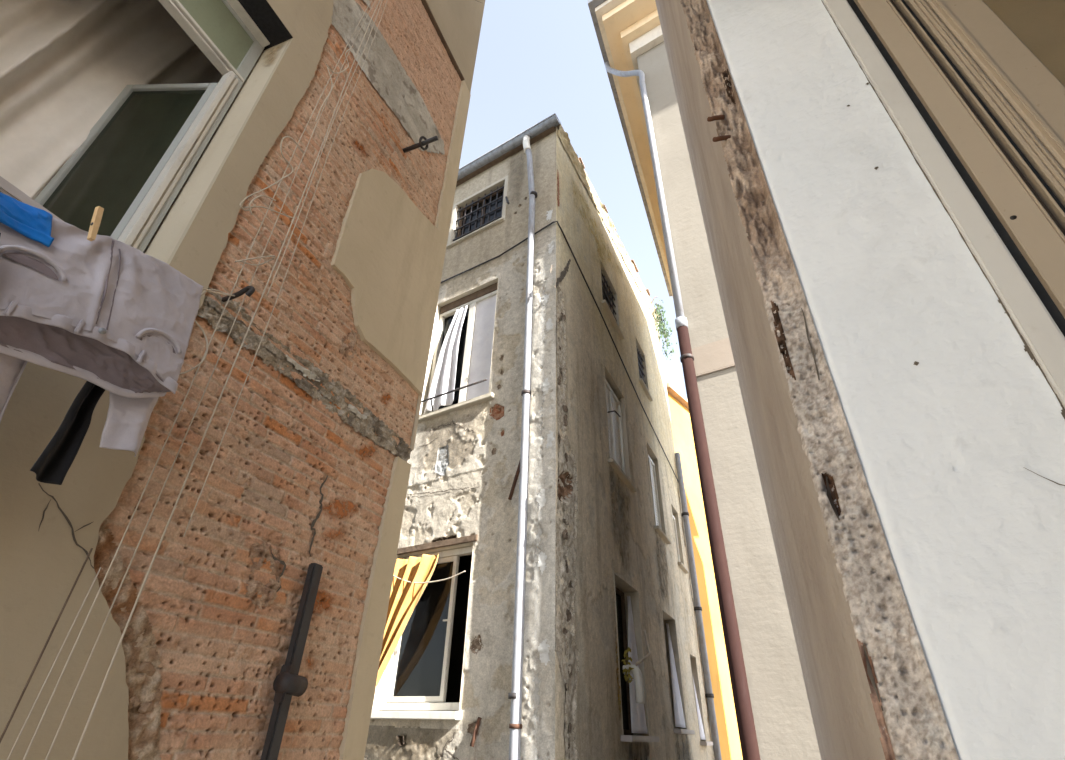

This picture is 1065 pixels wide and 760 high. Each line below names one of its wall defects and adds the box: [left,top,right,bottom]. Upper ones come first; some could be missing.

crack [38,483,94,569]
flaking render [94,0,461,760]
spalling [535,286,579,760]
flaking render [680,0,959,760]